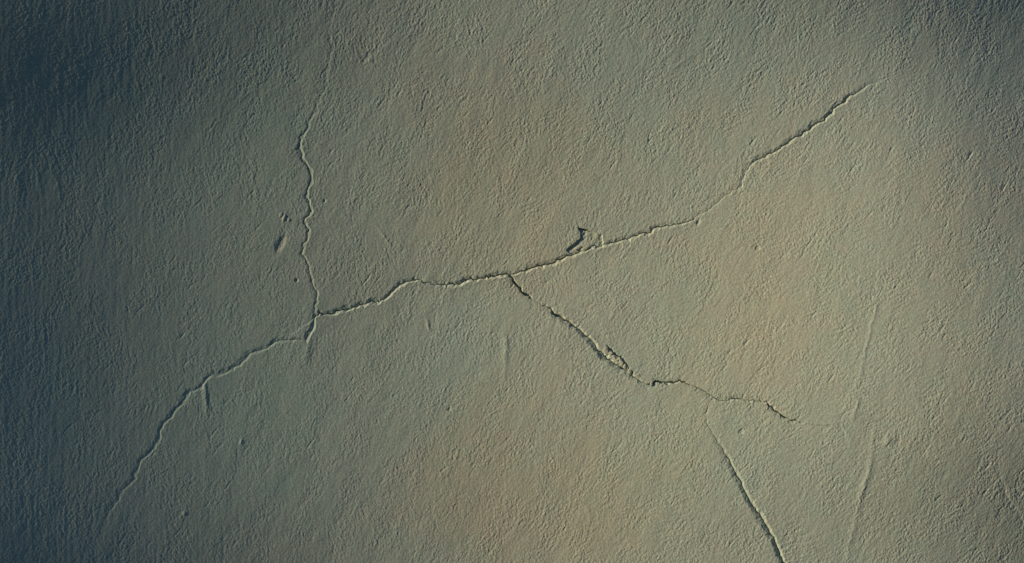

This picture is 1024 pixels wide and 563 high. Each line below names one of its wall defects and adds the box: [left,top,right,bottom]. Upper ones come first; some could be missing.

crack [100,0,962,534]
crack [705,398,792,563]